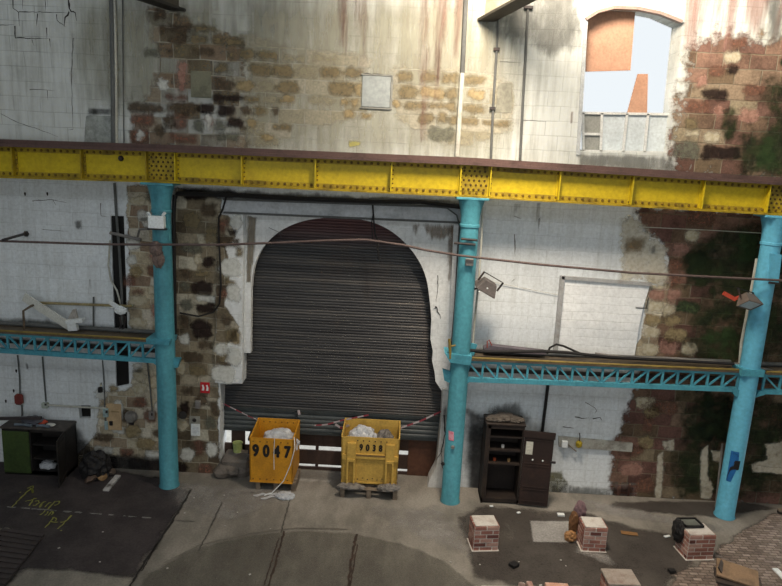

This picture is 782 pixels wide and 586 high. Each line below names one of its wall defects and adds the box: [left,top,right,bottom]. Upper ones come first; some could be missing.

crack [2,0,77,136]
peeling [128,7,371,148]
peeling [392,67,513,146]
leakage [506,0,579,55]
spalling [666,28,782,178]
peeling [125,184,155,330]
peeling [174,187,243,474]
spalling [620,208,762,363]
peeling [78,363,159,471]
crack [129,489,358,586]
spalling [609,371,737,501]
spalling [737,446,782,505]